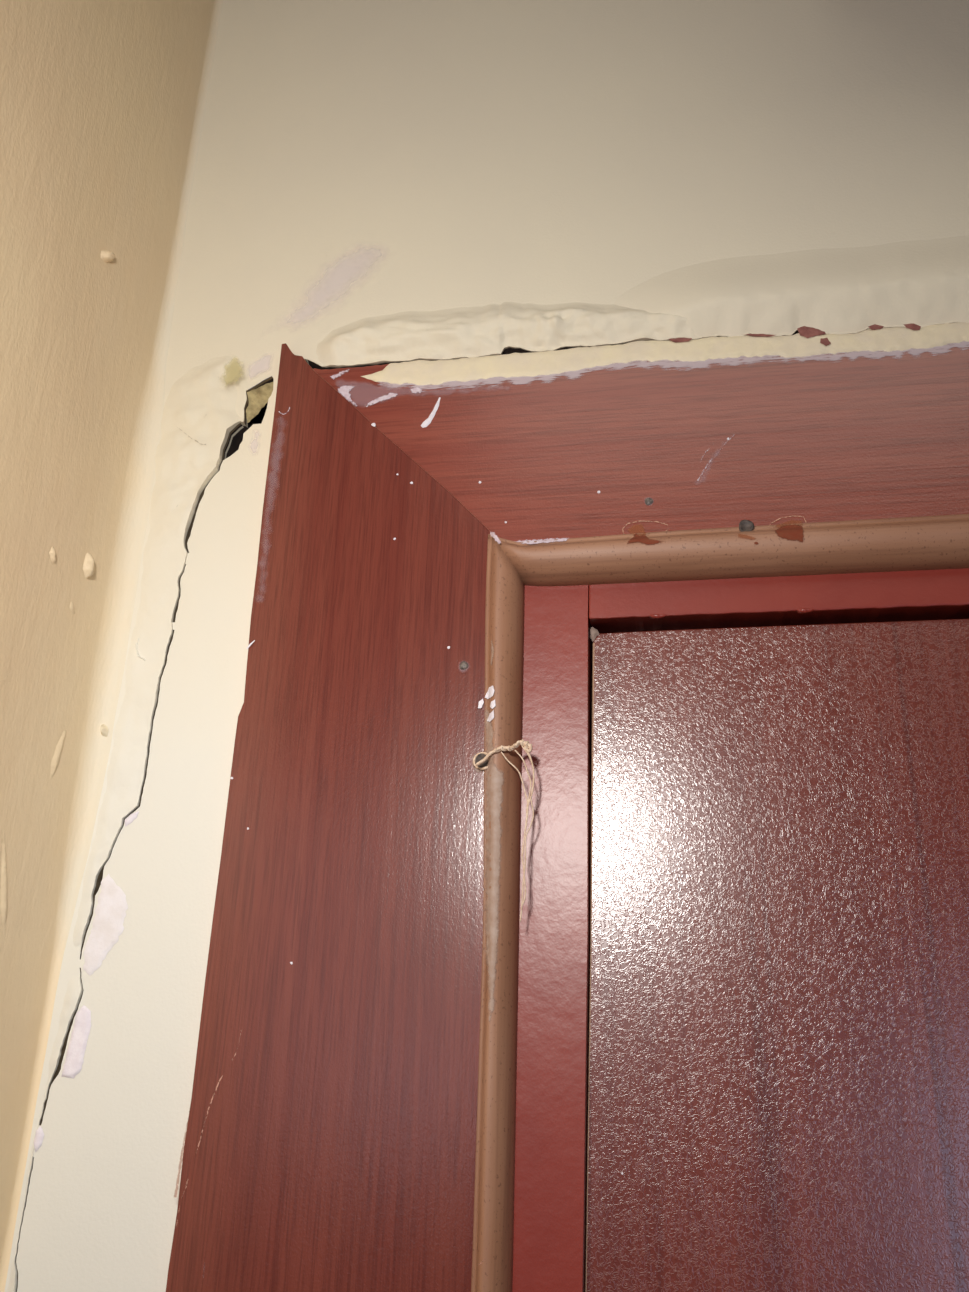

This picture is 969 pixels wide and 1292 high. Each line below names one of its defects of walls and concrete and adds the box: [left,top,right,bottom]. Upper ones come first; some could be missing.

crack [305,360,437,370]
crack [502,347,577,355]
crack [40,461,223,1125]
peeling [83,874,128,975]
peeling [61,1005,91,1078]
crack [15,1157,34,1292]